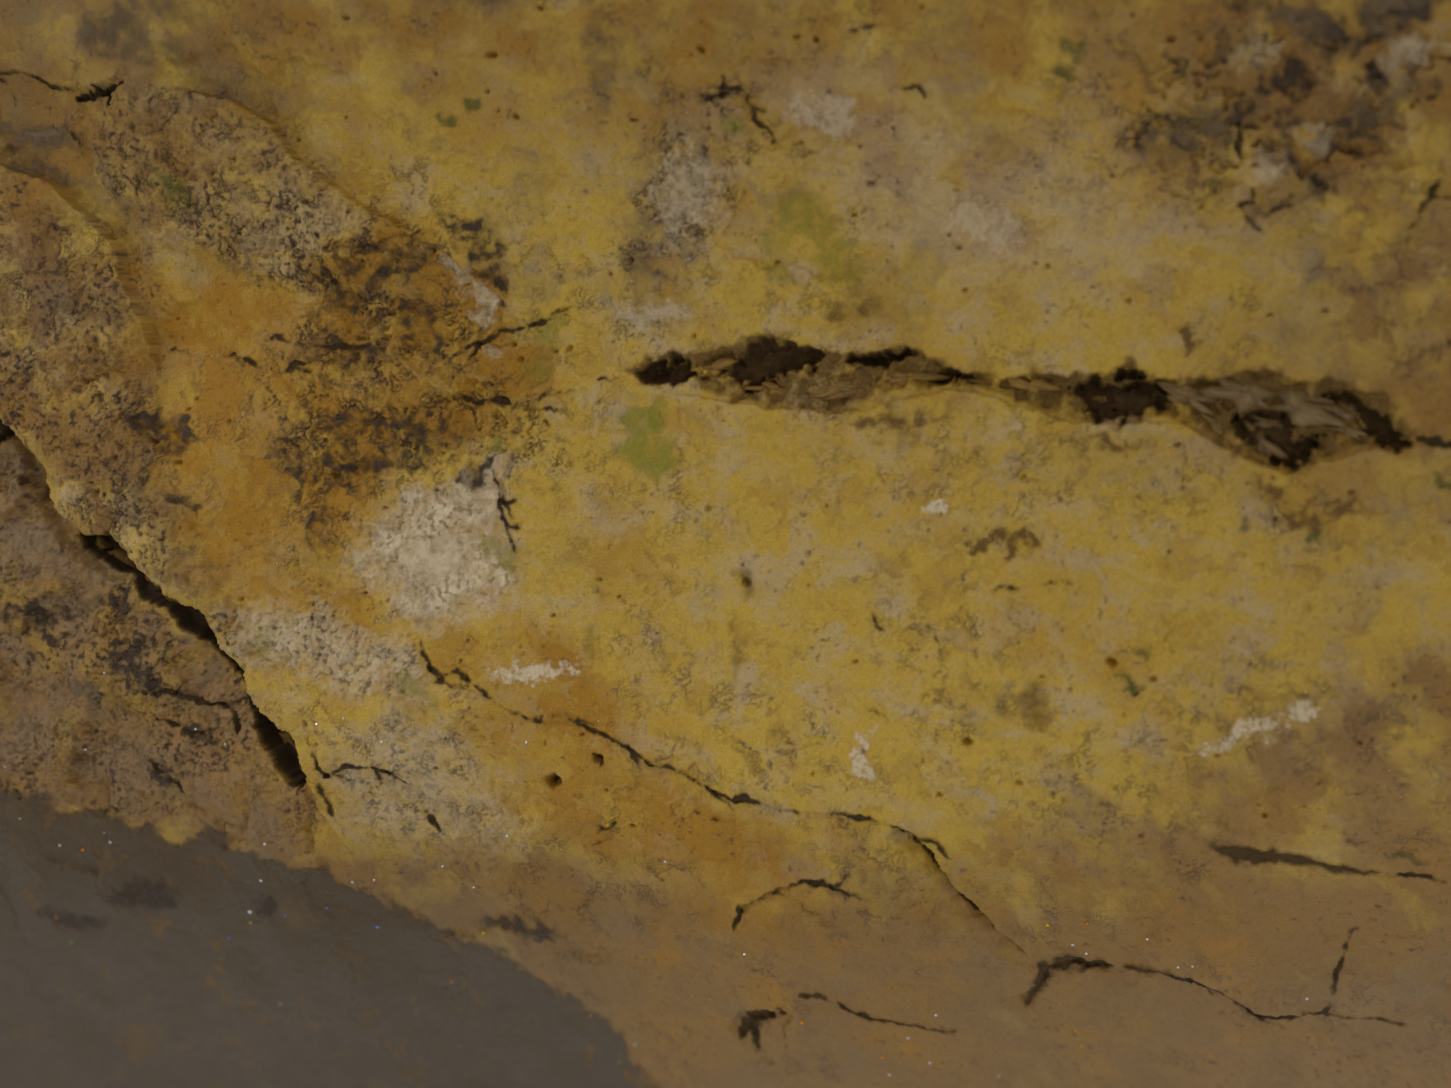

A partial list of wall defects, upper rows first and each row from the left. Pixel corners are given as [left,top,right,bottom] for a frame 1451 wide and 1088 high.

water stain [1270,172,1328,212]
water stain [442,215,506,328]
water stain [322,243,449,360]
crack [1416,436,1451,448]
water stain [265,402,461,545]
water stain [455,457,492,489]
crack [152,685,240,734]
crack [152,762,184,792]
crack [420,643,981,912]
crack [1398,872,1435,880]
crack [732,874,860,930]